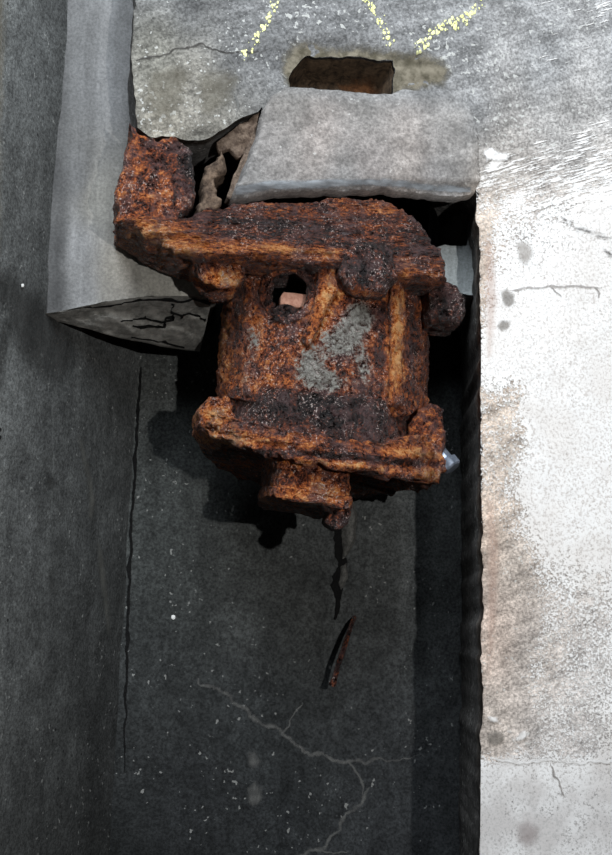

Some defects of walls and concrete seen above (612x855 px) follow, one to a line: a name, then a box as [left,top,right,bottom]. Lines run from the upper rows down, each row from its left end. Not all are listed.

spalling [136,43,264,206]
crack [511,285,602,298]
crack [123,367,142,771]
rust [318,505,351,531]
crack [330,498,357,620]
crack [198,678,416,855]